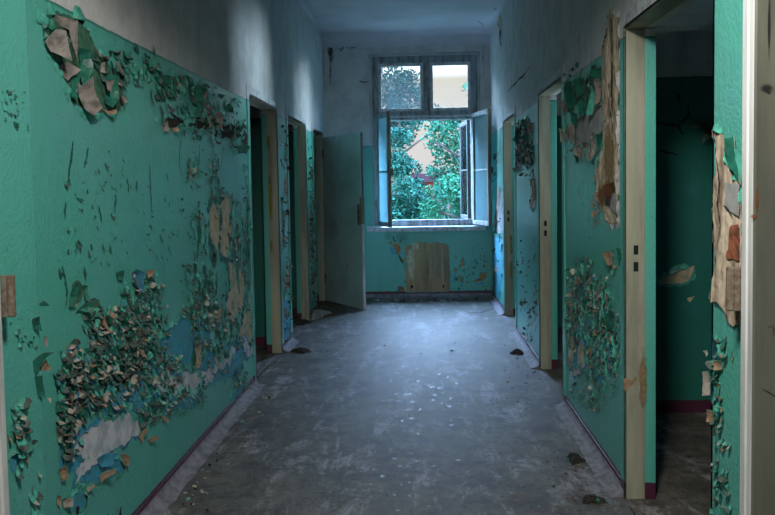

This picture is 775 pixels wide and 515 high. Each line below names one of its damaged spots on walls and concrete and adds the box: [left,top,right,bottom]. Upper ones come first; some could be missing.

peeling [36,2,128,123]
peeling [6,154,254,515]
flaking render [404,144,538,346]
peeling [512,113,537,213]
flaking render [558,4,621,232]
peeling [564,247,647,412]
flaking render [702,123,742,515]